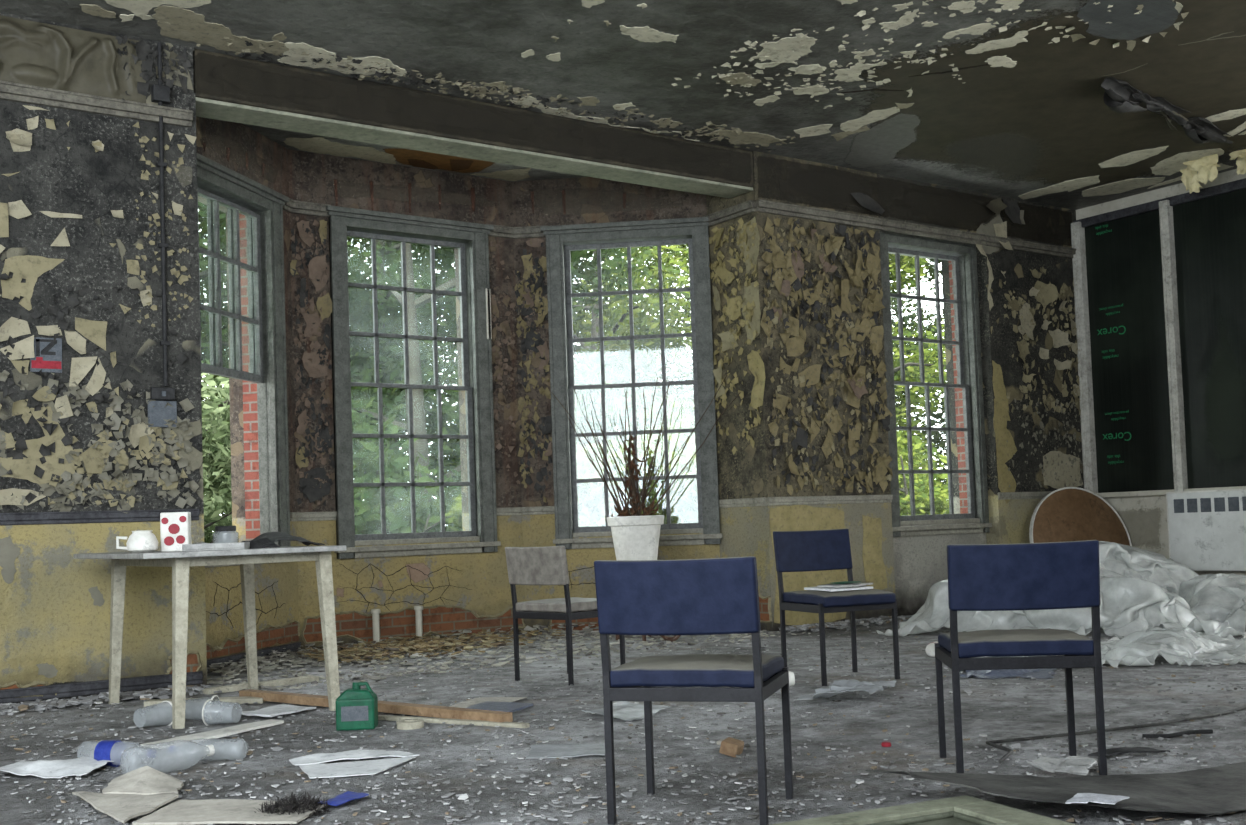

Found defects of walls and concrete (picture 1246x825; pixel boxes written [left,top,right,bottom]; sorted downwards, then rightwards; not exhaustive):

peeling [6,105,70,152]
peeling [80,0,914,152]
peeling [672,0,1189,109]
peeling [976,77,1246,256]
peeling [0,122,199,513]
peeling [290,216,335,506]
peeling [488,238,553,503]
peeling [709,217,893,495]
peeling [1001,266,1084,487]